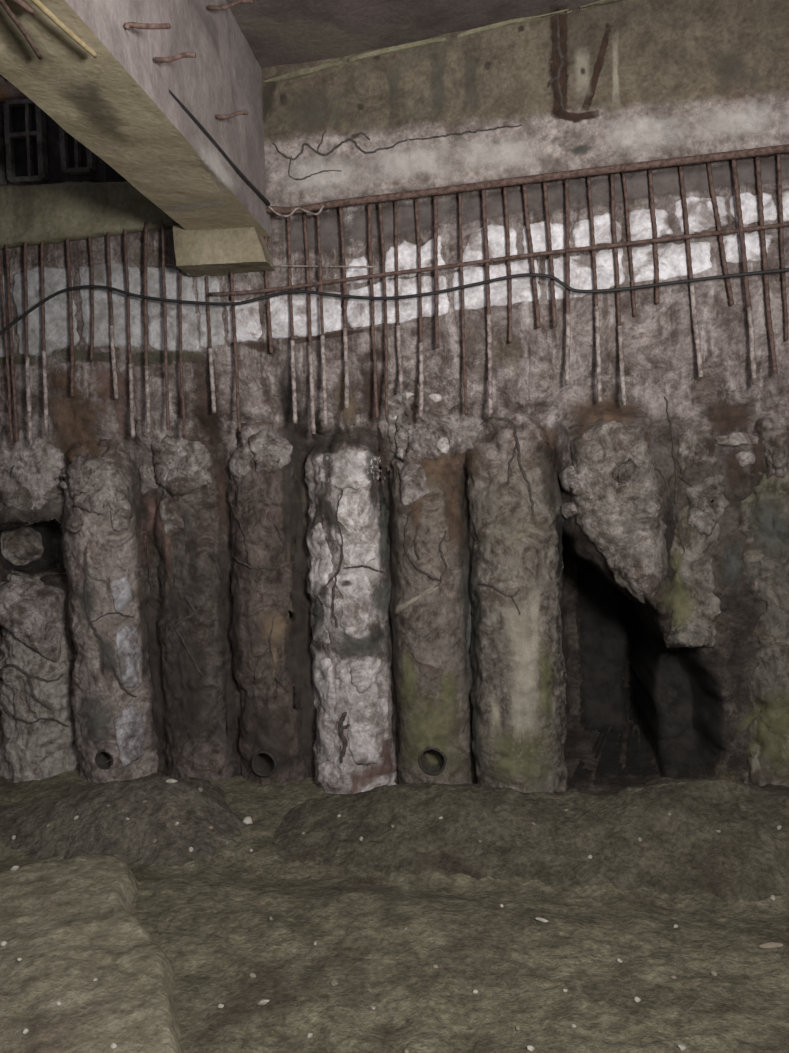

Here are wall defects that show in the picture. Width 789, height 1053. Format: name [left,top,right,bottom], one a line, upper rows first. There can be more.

corrosion [550,6,610,123]
leakage [281,155,789,252]
flaking render [0,154,789,768]
crack [478,416,534,516]
crack [324,490,384,628]
crack [0,664,69,727]
crack [338,711,350,763]